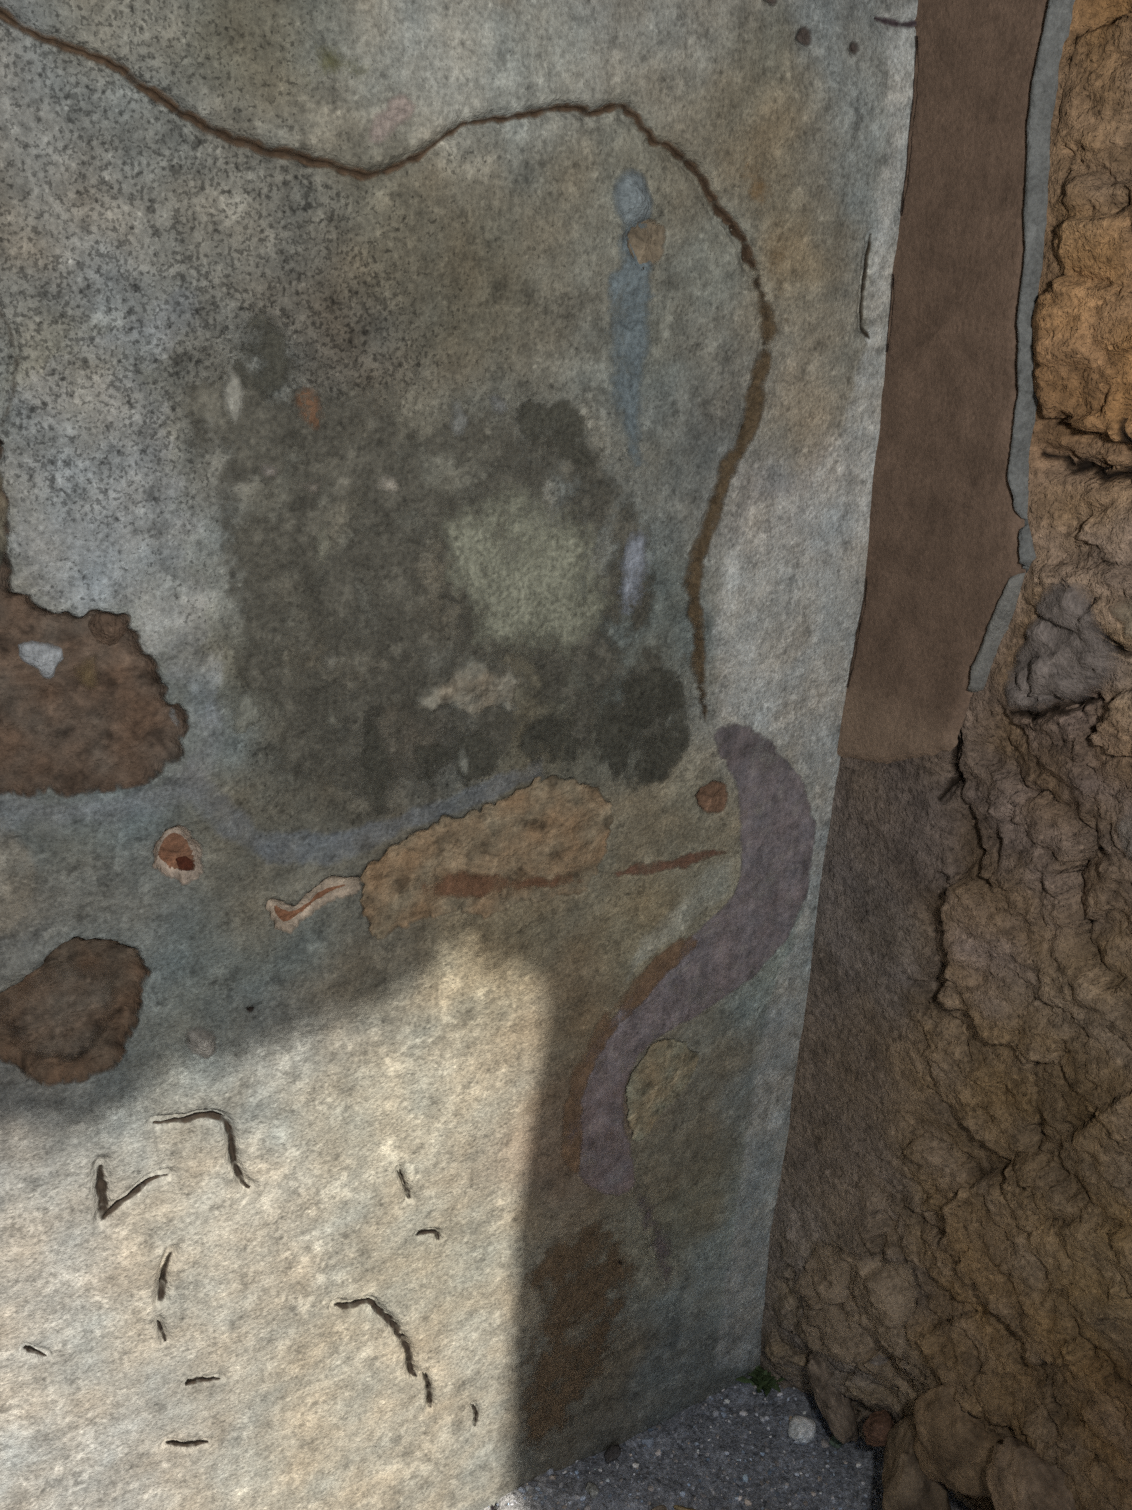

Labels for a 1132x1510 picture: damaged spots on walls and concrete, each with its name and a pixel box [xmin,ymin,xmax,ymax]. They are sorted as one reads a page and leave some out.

crack [0,7,776,722]
water stain [609,216,651,464]
spalling [0,439,189,797]
water stain [189,312,689,814]
flaking render [266,776,613,939]
spalling [0,937,151,1085]
crack [95,1164,168,1221]
crack [153,1110,250,1188]
crack [399,1169,440,1240]
crack [158,1252,172,1341]
crack [335,1298,433,1408]
crack [166,1439,209,1447]